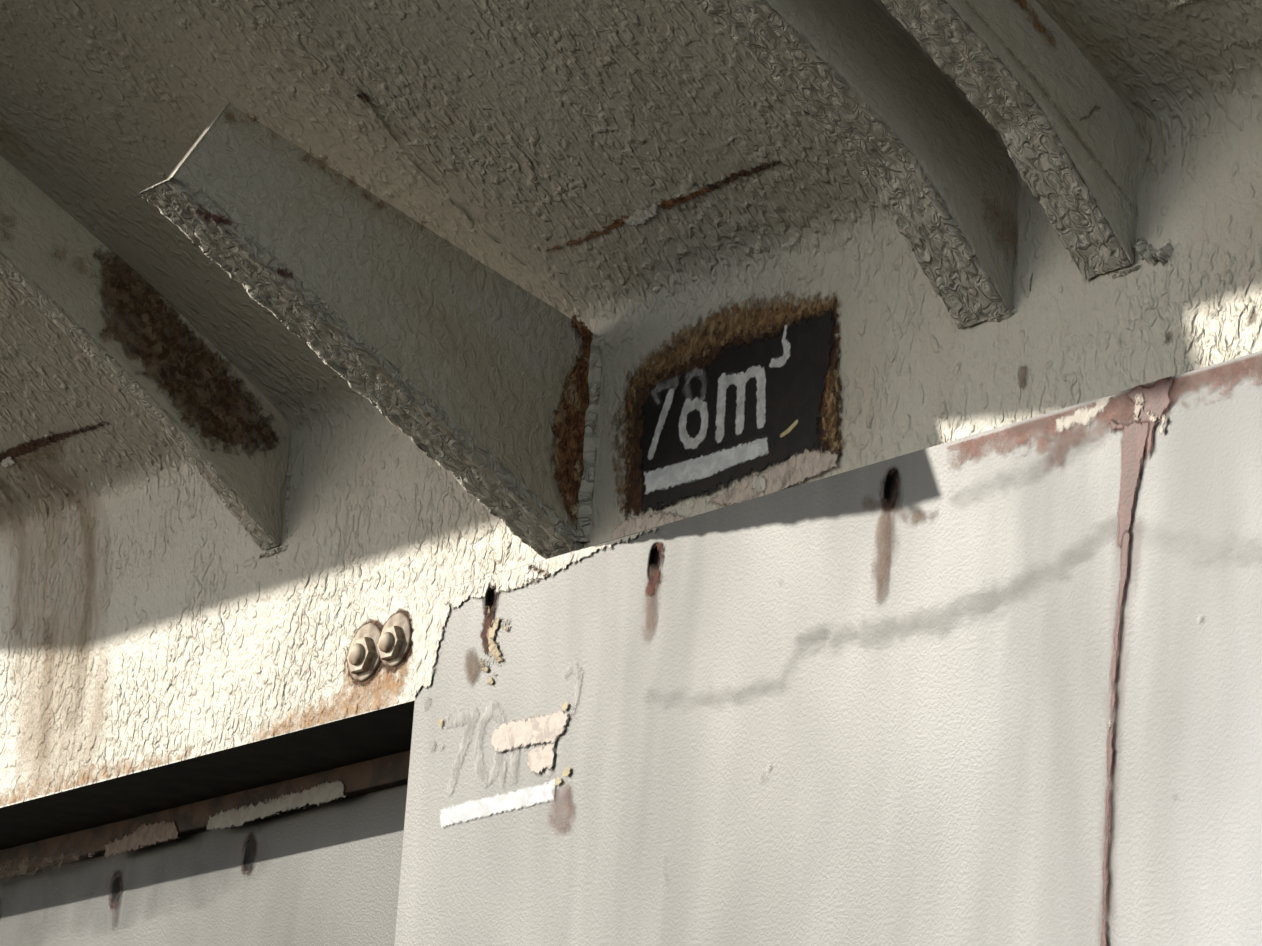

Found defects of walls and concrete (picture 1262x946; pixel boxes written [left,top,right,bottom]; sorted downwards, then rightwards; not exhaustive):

corrosion [196,209,233,226]
crack [546,160,781,253]
corrosion [79,250,278,455]
crack [0,421,110,468]
corrosion [611,291,844,521]
peeling [708,449,838,506]
corrosion [876,467,899,597]
corrosion [261,609,414,739]
corrosion [466,583,510,686]
peeling [405,509,685,699]
corrosion [645,542,663,631]